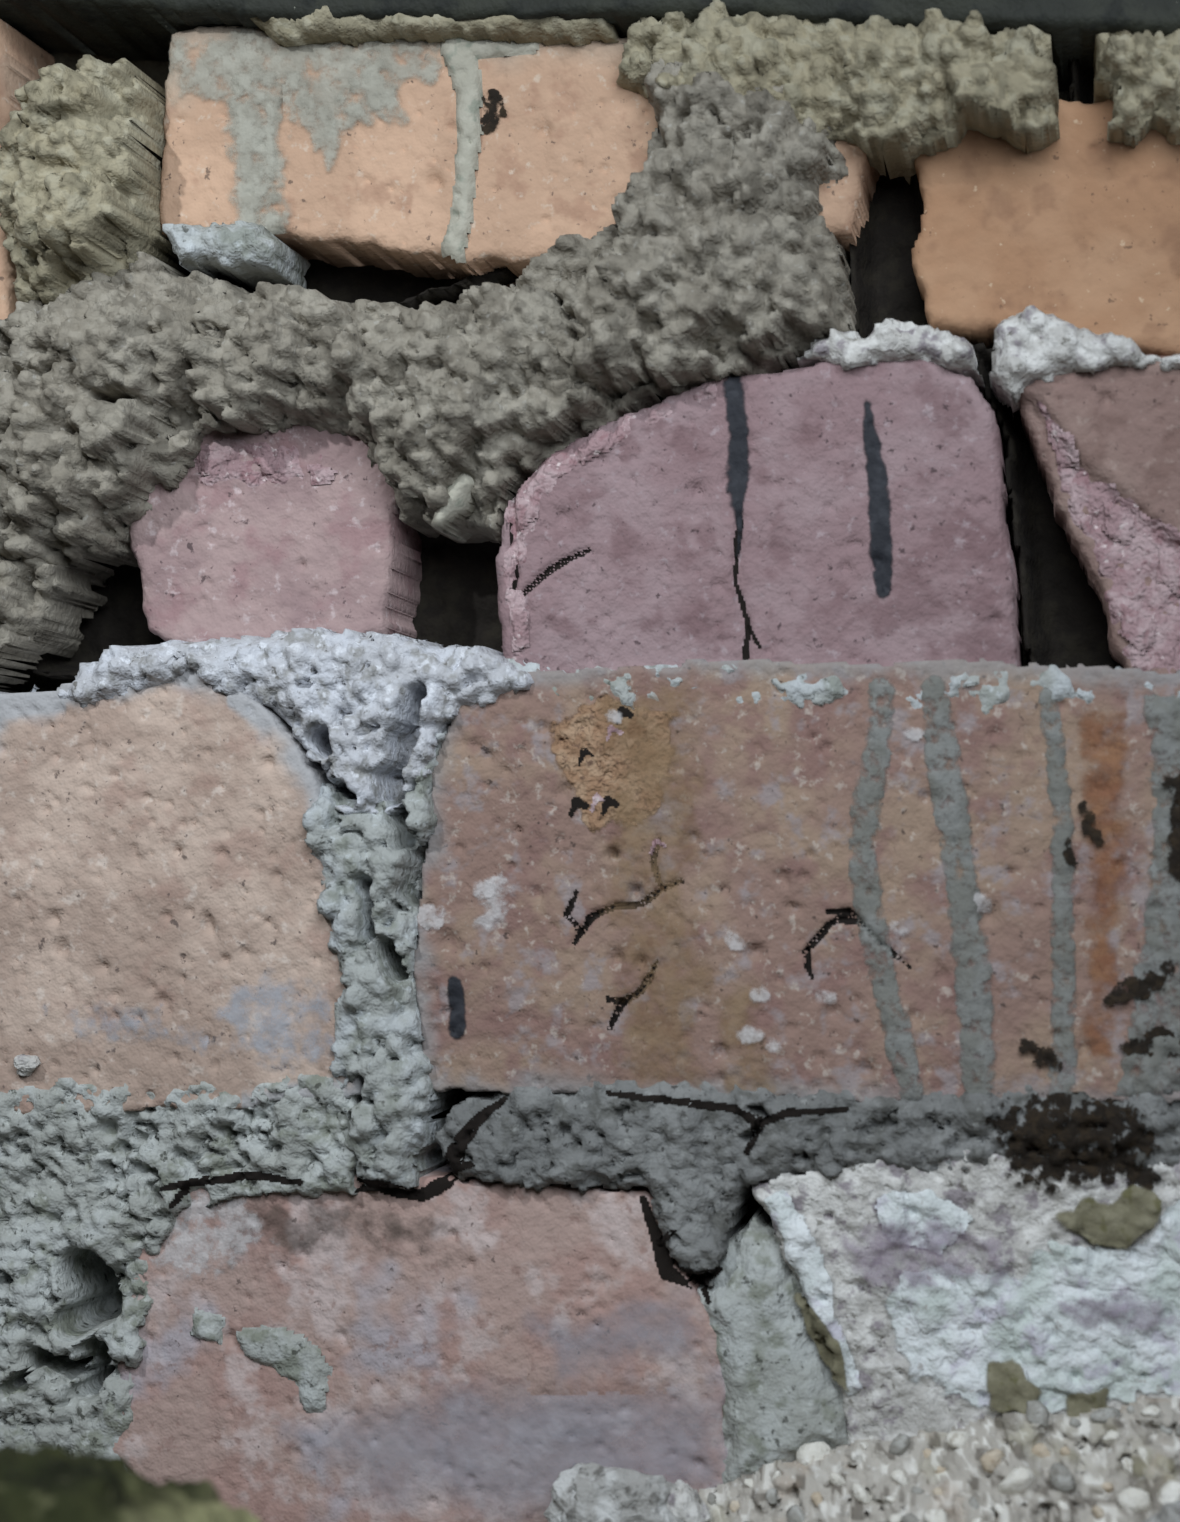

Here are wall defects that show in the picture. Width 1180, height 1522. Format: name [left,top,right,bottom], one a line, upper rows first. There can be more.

crack [733,519,761,660]
damp [906,729,923,741]
damp [418,905,443,930]
damp [476,877,503,927]
crack [563,837,684,946]
damp [974,894,990,912]
crack [802,908,911,980]
crack [606,959,659,1030]
damp [752,990,769,1000]
damp [740,1027,776,1050]